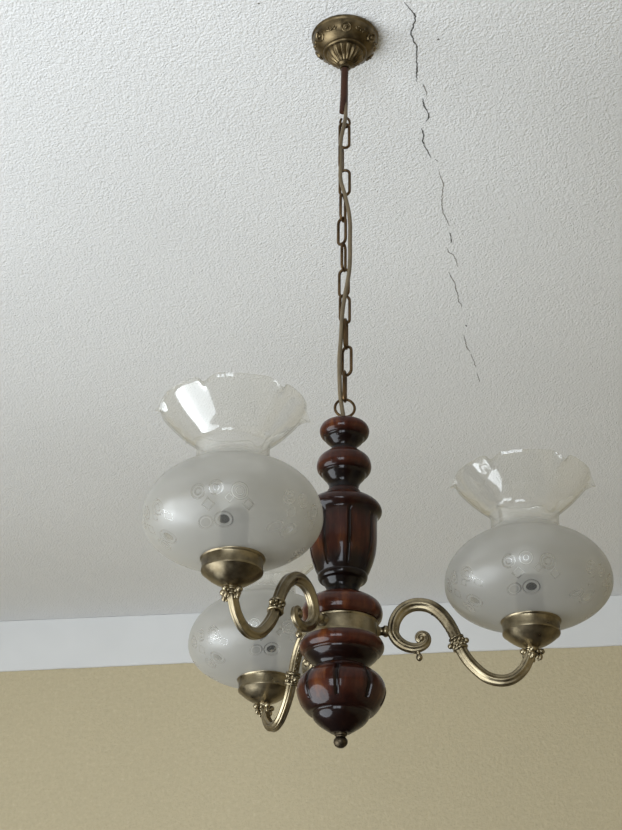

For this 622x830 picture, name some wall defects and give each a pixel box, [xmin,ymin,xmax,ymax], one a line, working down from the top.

crack [404,2,480,382]